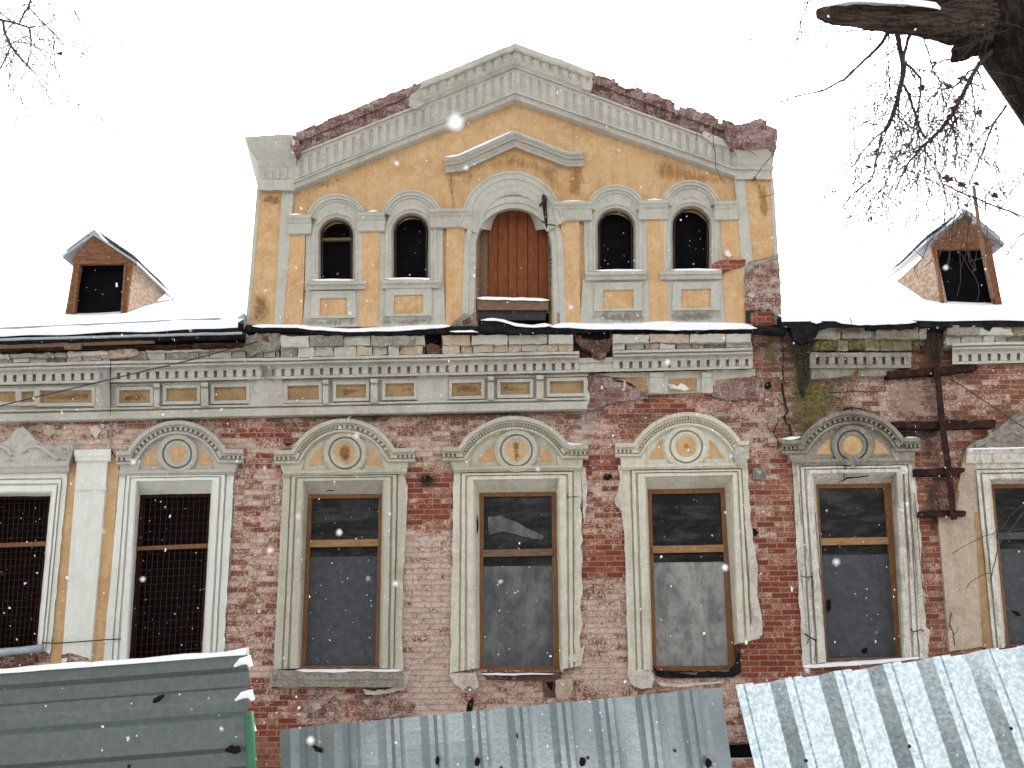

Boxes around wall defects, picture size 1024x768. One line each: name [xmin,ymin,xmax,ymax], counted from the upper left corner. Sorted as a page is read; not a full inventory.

flaking render [712,250,782,326]
peeling [576,332,611,340]
flaking render [584,375,648,411]
damp [787,330,819,398]
crack [771,336,881,448]